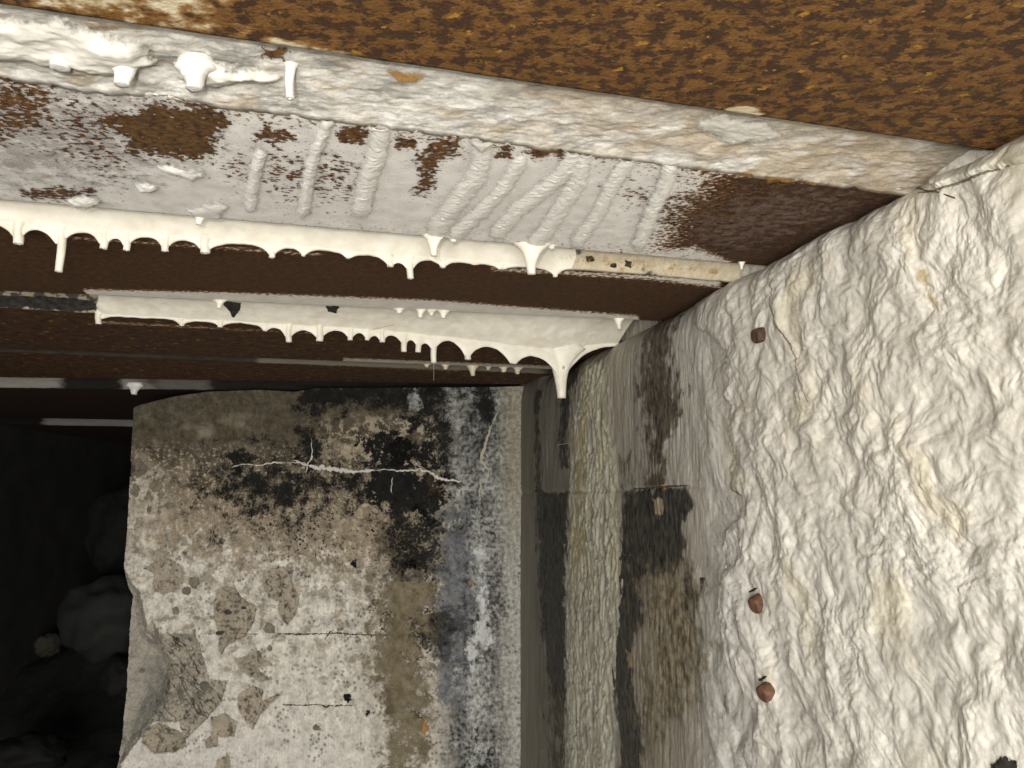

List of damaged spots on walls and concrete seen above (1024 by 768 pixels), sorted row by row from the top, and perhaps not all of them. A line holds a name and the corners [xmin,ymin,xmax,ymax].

rust [0,78,369,214]
efflorescence [0,120,636,275]
rust [616,167,658,222]
rust [653,171,870,260]
water stain [96,295,633,469]
crack [232,413,498,500]
water stain [178,387,505,768]
water stain [534,390,569,768]
water stain [612,308,708,768]